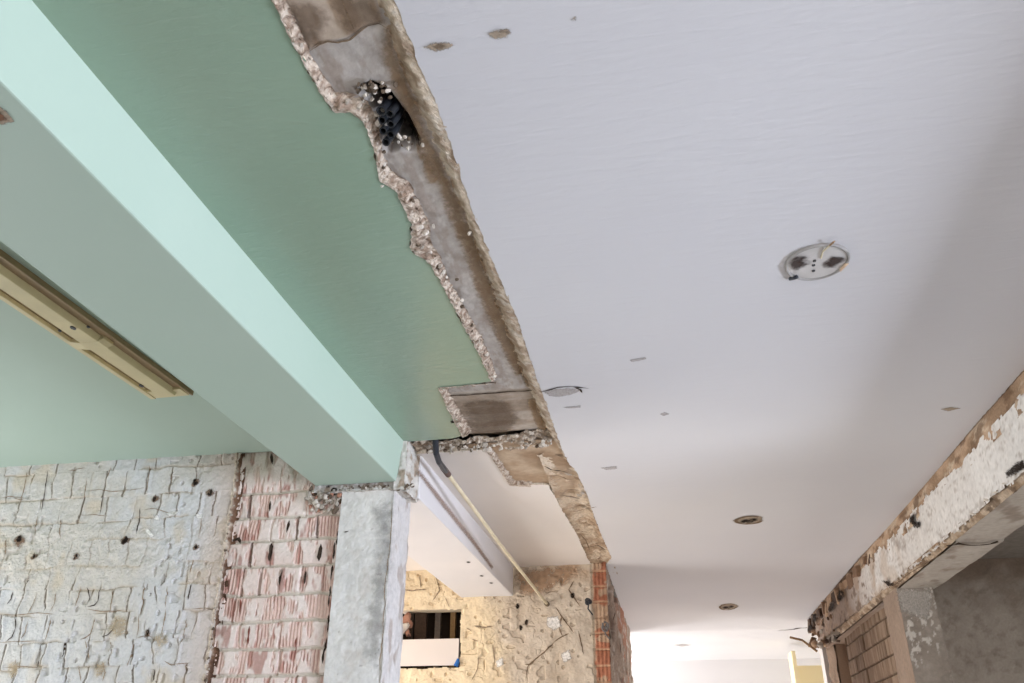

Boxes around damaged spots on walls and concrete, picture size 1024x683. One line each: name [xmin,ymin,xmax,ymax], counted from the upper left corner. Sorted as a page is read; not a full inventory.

flaking render [272,0,618,577]
crack [3,467,172,556]
crack [0,561,213,680]
flaking render [807,370,1024,634]